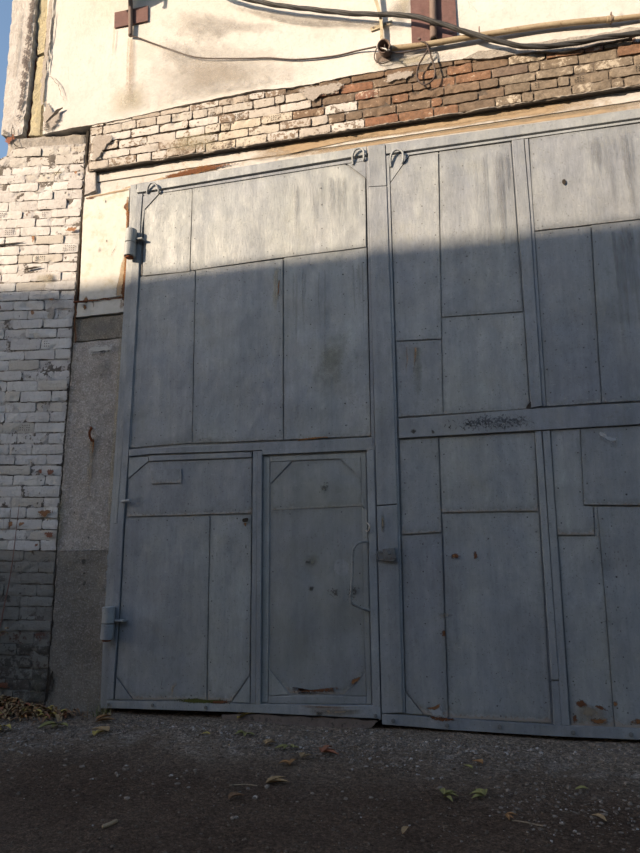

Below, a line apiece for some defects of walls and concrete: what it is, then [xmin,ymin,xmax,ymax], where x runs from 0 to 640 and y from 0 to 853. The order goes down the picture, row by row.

flaking render [40,0,64,132]
peeling [387,71,414,82]